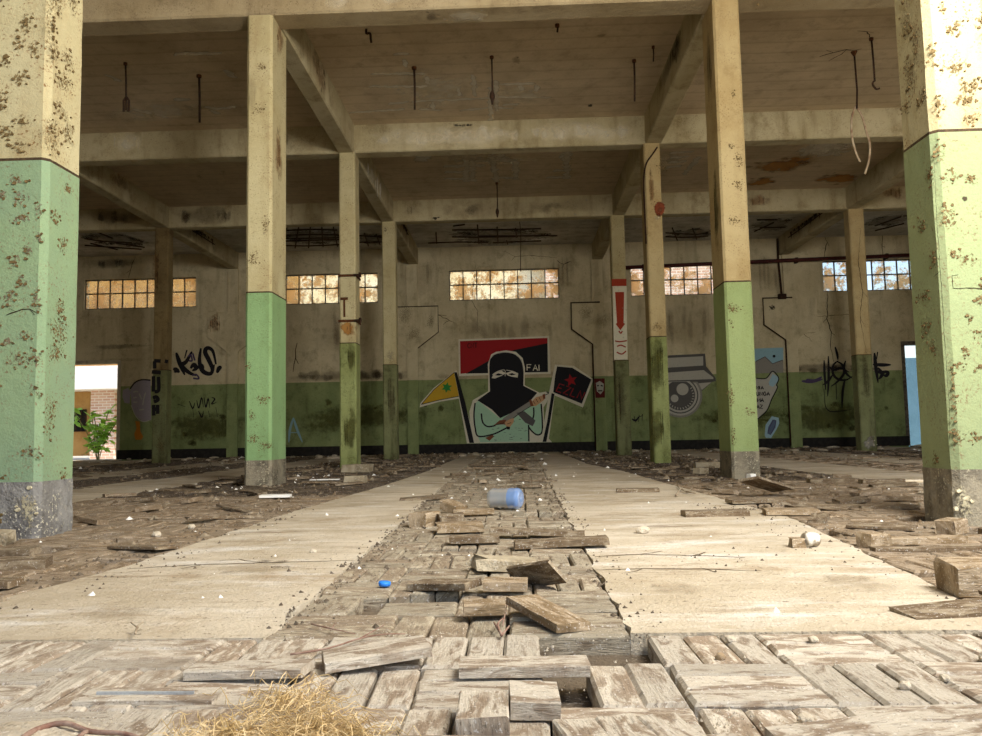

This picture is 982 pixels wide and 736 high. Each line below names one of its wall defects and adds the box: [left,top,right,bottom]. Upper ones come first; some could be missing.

corrosion [748,157,810,185]
spalling [754,213,822,239]
damp [650,349,664,384]